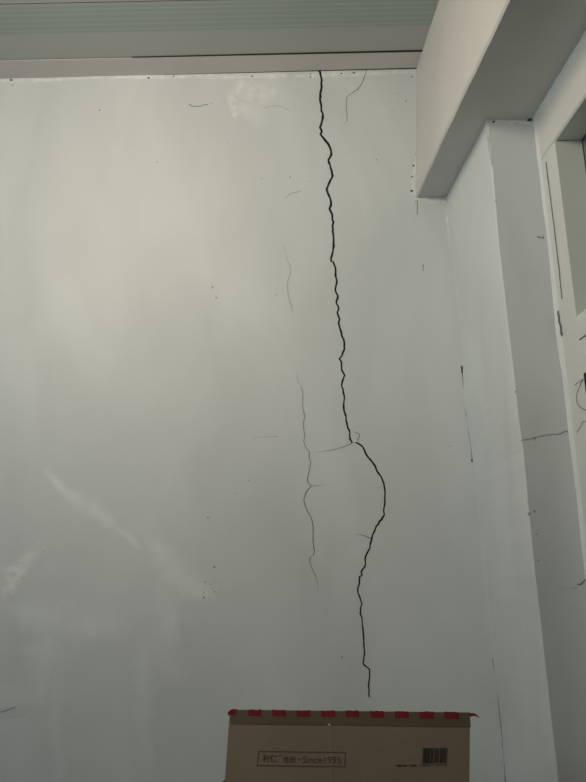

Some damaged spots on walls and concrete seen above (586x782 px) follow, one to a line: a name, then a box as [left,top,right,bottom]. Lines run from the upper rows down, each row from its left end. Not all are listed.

crack [318,71,386,697]